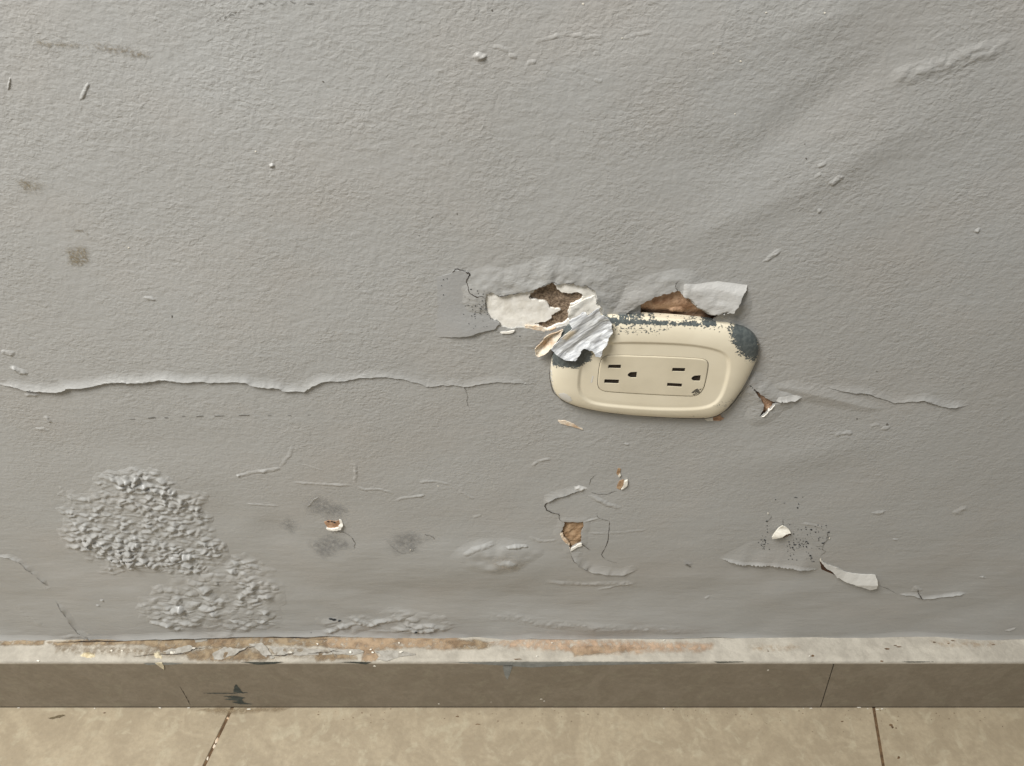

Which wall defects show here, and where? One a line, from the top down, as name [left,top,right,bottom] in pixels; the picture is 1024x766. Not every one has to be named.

peeling [436,255,753,361]
flaking render [324,519,343,531]
peeling [544,468,648,576]
peeling [720,513,878,590]